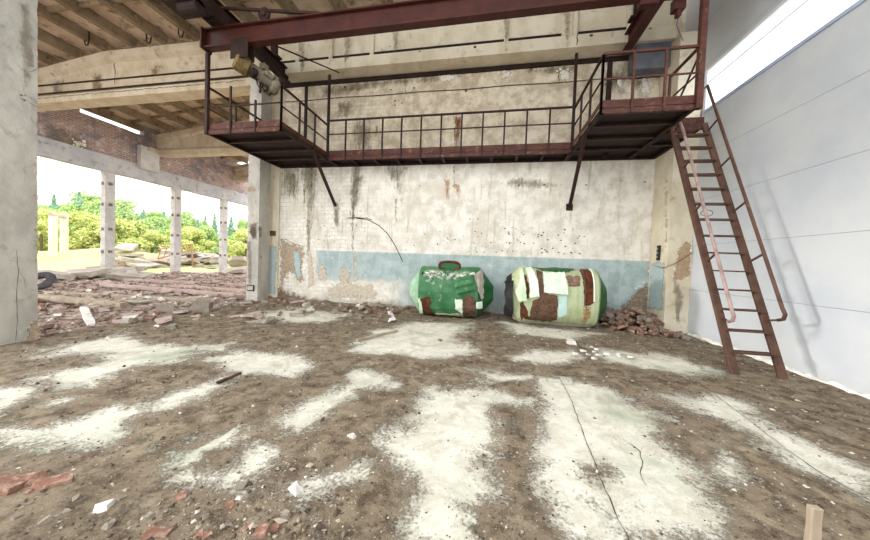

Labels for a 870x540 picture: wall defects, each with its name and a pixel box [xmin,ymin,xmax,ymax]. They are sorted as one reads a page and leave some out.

leakage [281,168,316,251]
leakage [352,167,360,219]
peeling [268,213,377,301]
peeling [618,242,693,322]
crack [558,375,629,540]